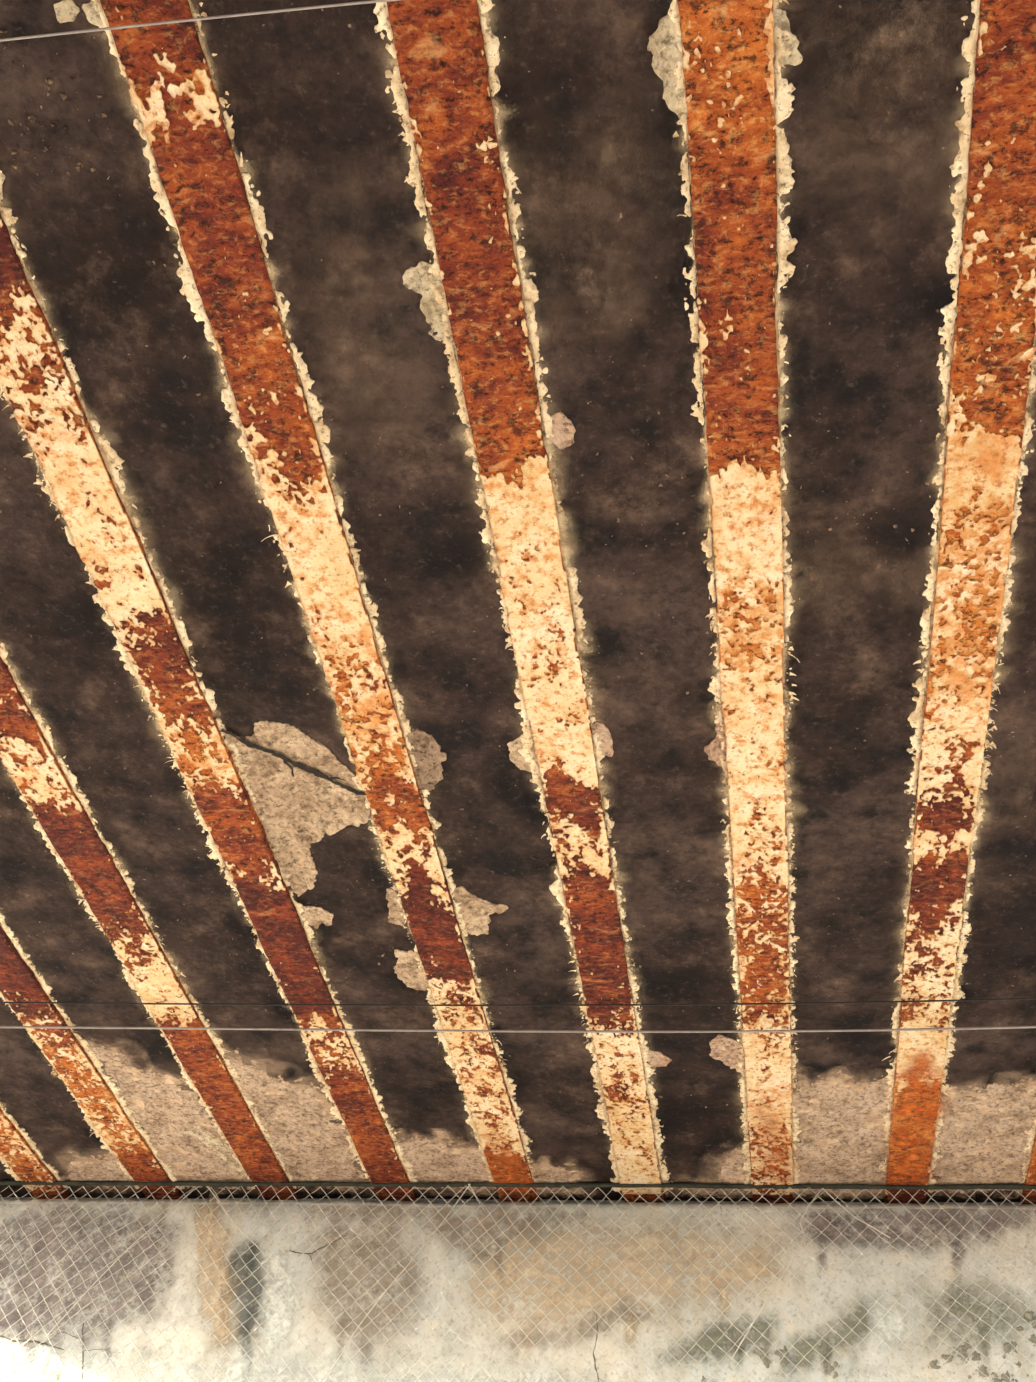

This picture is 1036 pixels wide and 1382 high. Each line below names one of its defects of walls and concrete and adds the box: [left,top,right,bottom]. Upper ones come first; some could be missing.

peeling [0,0,586,1197]
peeling [373,0,1036,1199]
crack [219,729,366,796]
rust [888,1055,941,1182]
leakage [807,1208,1036,1265]
leakage [0,1205,558,1382]
leakage [672,1320,772,1362]
leakage [786,1299,905,1369]
leakage [934,1286,1025,1355]